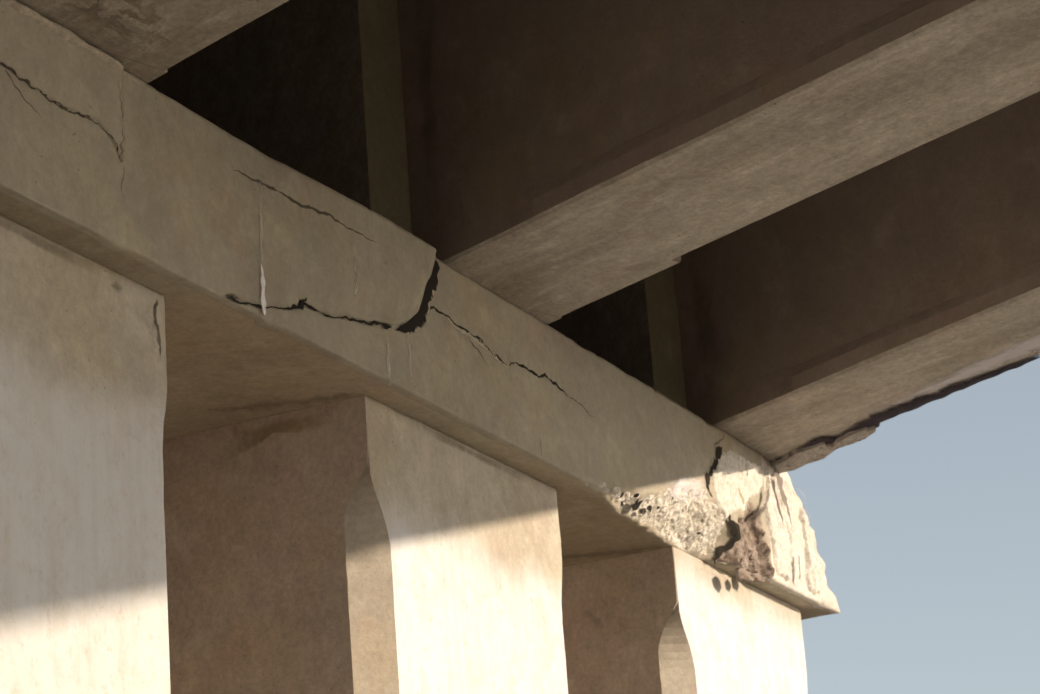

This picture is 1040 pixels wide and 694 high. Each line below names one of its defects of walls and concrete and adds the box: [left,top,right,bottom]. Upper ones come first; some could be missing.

crack [0,62,119,152]
crack [233,170,375,242]
crack [153,300,161,355]
crack [226,260,594,417]
spalling [620,492,674,514]